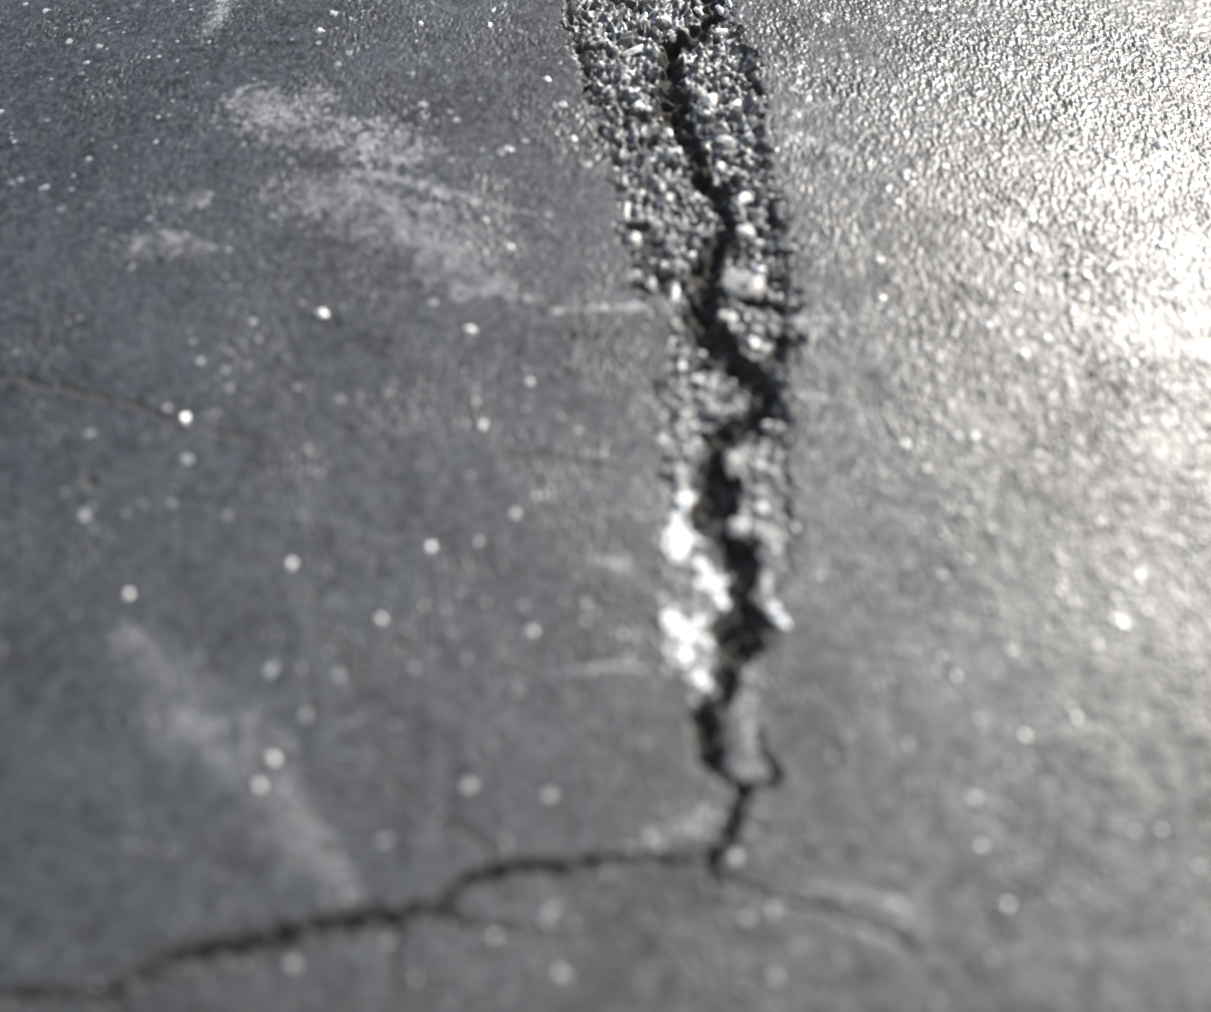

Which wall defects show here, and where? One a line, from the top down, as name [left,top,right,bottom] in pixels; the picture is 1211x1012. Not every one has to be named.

crack [0,0,920,1012]
spalling [558,0,807,716]